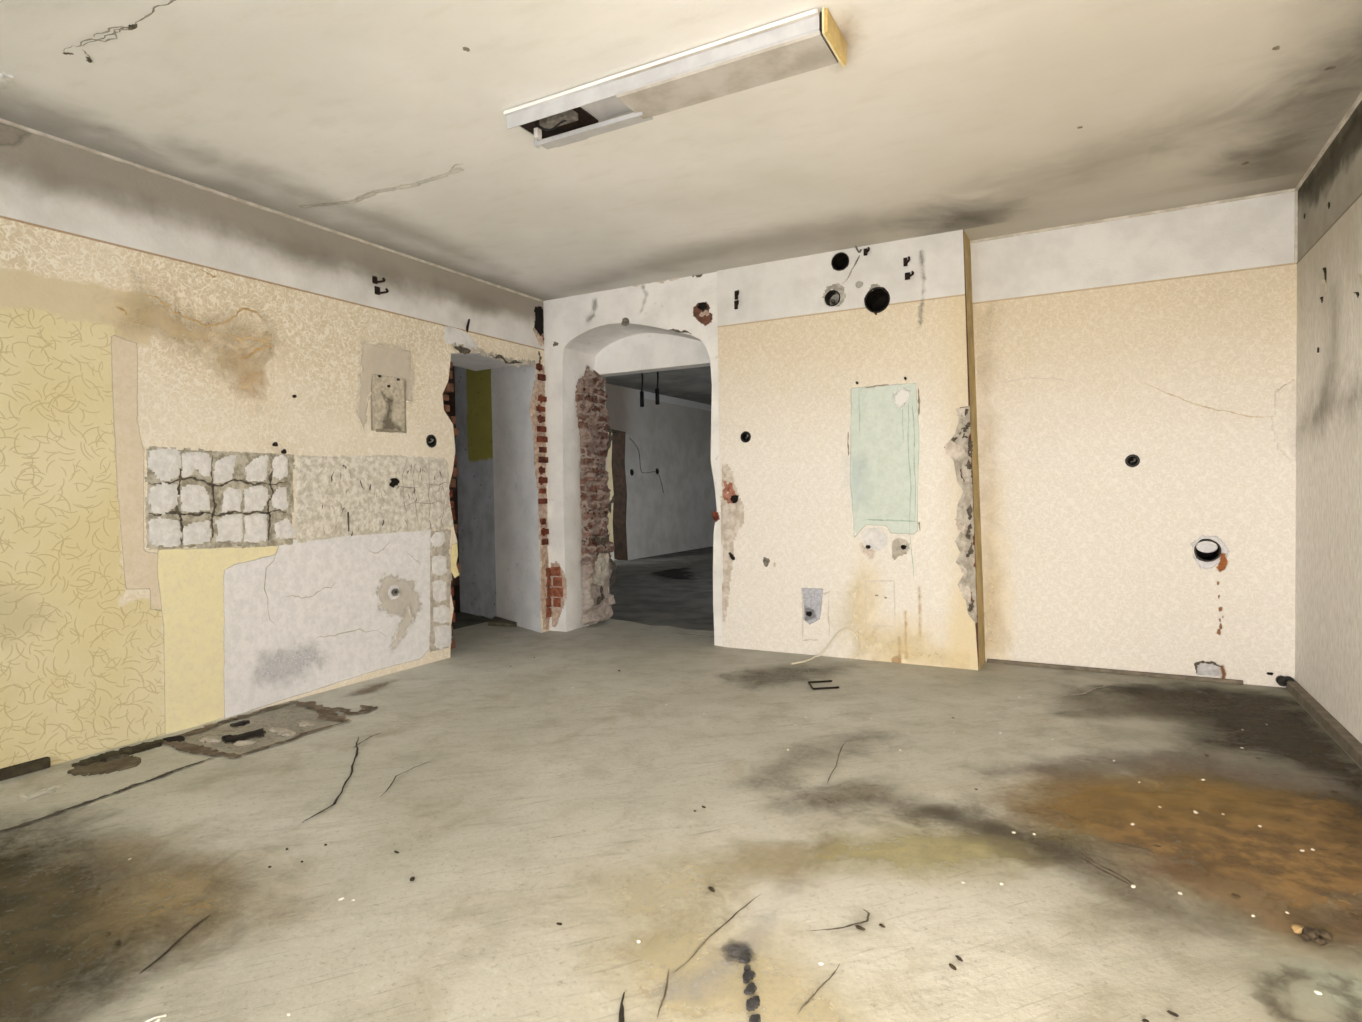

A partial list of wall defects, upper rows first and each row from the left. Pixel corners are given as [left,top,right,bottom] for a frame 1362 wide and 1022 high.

crack [63,0,176,63]
peeling [0,123,29,145]
spalling [533,306,559,347]
flaking render [158,530,431,744]
flaking render [442,342,567,649]
flaking render [945,406,977,623]
rust [1217,553,1227,635]
damp [0,829,221,1022]